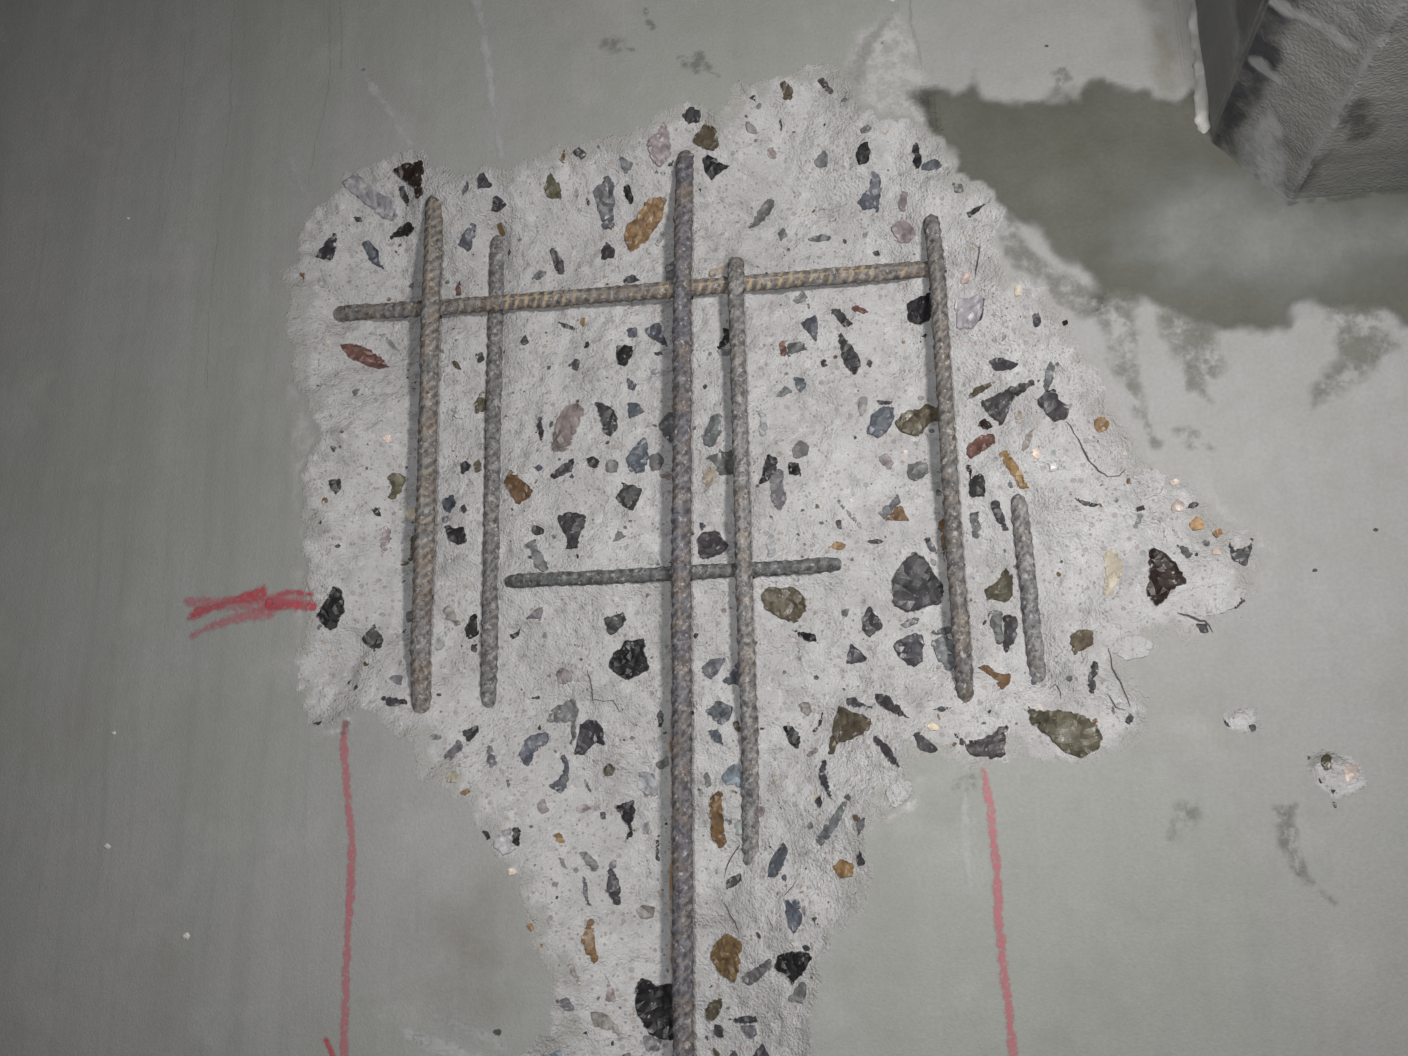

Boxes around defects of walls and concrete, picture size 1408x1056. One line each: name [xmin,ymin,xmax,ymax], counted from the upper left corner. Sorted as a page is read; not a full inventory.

damp [1235,38,1281,83]
damp [915,80,1408,394]
spalling [281,63,1265,1056]
spalling [1305,748,1368,809]